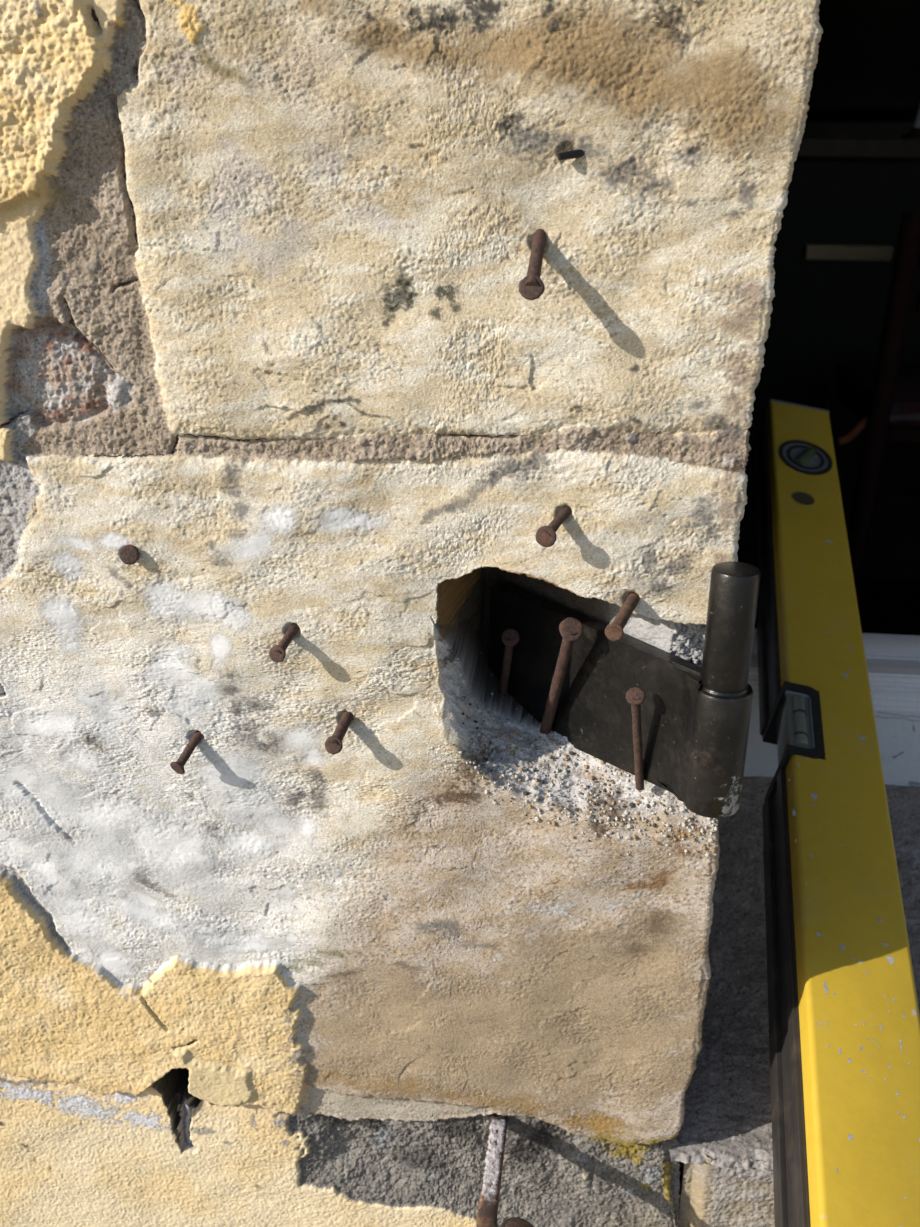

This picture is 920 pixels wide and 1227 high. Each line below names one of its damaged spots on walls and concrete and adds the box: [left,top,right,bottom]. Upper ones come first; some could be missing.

leakage [357,0,790,146]
flaking render [0,426,15,462]
spalling [51,532,131,580]
spalling [229,505,298,561]
spalling [41,599,83,652]
spalling [140,580,251,717]
spalling [0,683,323,978]
peeling [0,1078,168,1131]